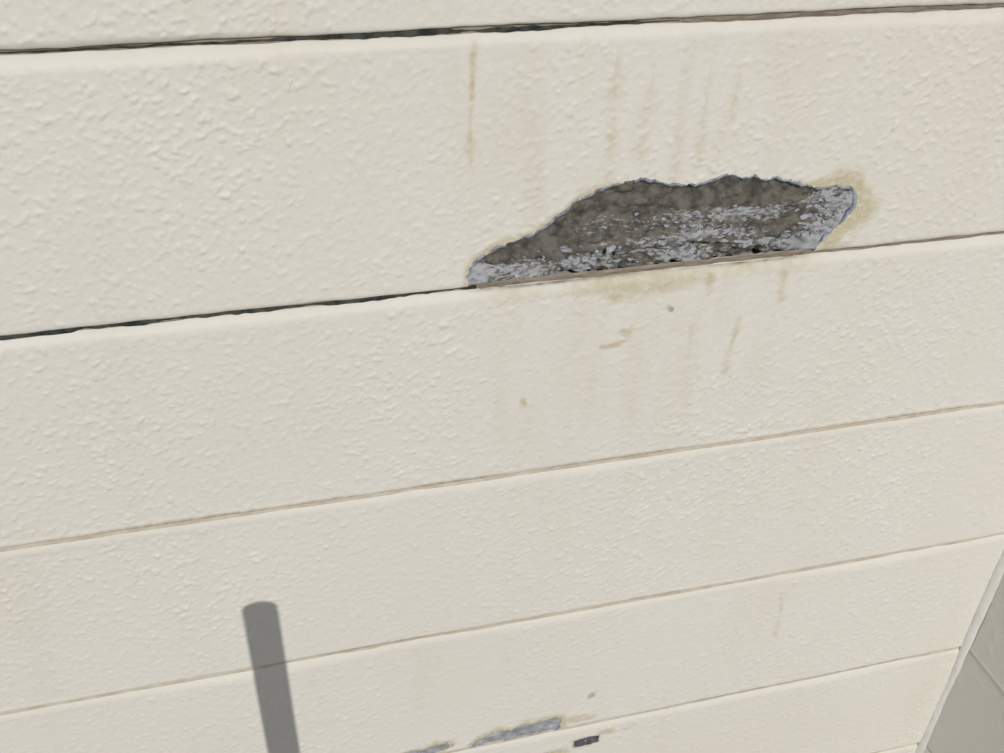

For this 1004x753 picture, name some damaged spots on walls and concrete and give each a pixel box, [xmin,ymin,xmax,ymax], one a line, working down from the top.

spalling [465,173,857,285]
peeling [407,742,453,753]
peeling [469,717,562,748]